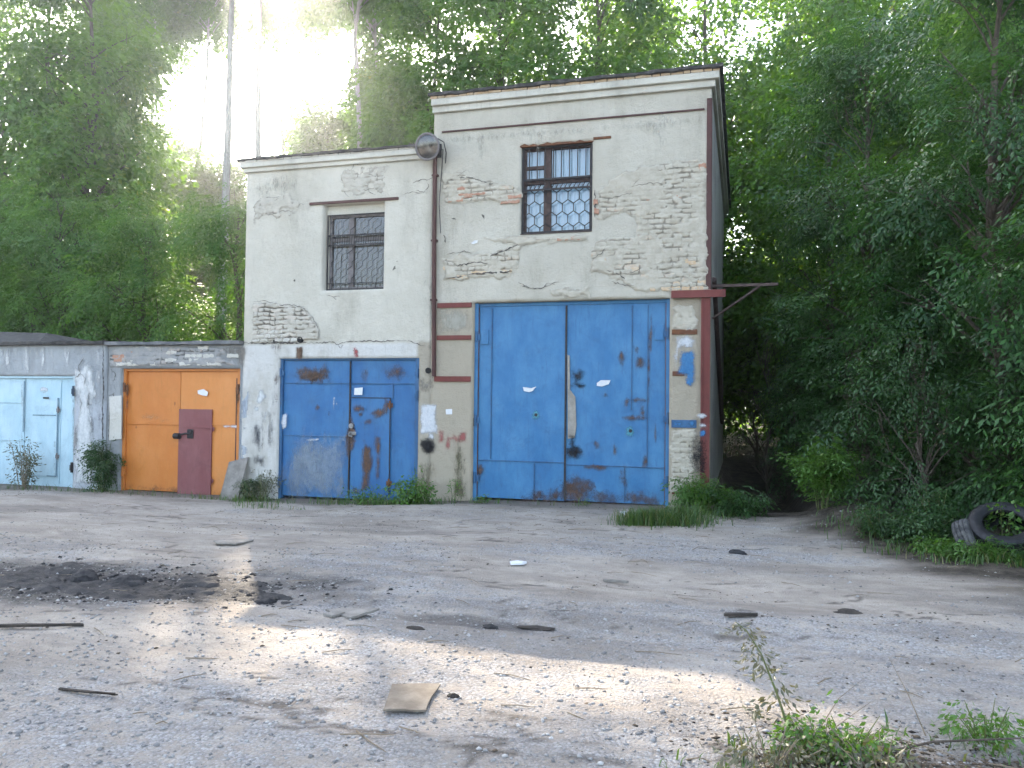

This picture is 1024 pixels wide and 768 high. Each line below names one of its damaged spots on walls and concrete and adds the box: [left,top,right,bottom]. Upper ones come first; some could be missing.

spalling [441,159,709,293]
spalling [251,301,320,343]
spalling [671,304,699,330]
rust [346,403,387,492]
spalling [669,428,699,493]